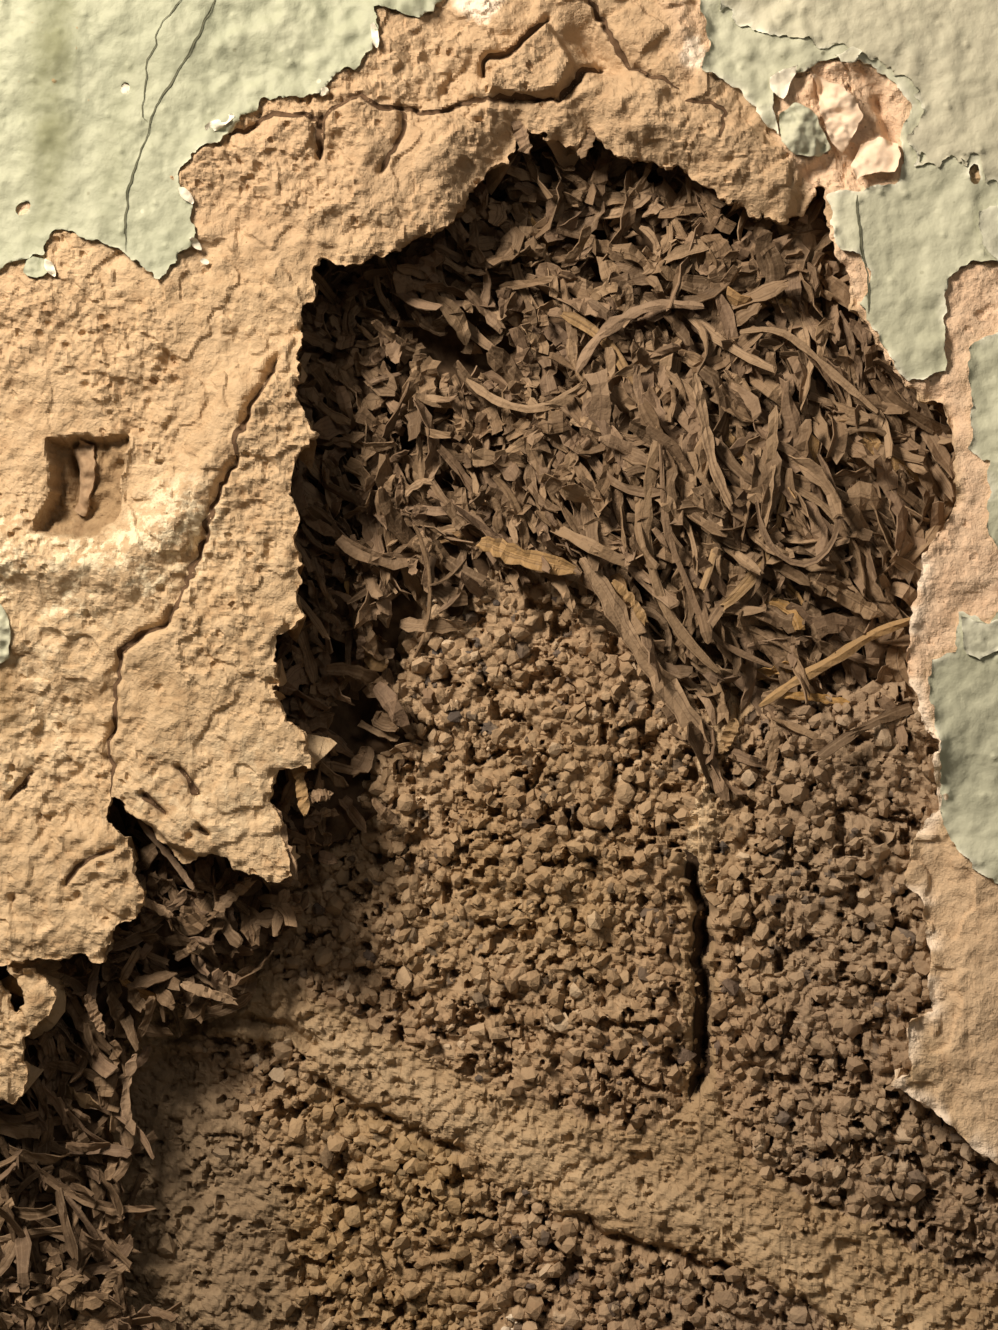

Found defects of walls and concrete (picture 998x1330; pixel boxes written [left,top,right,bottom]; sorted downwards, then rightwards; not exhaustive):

peeling [234,0,912,192]
spalling [0,317,337,1105]
crack [107,356,280,796]
peeling [0,97,499,850]
spalling [269,84,998,1165]